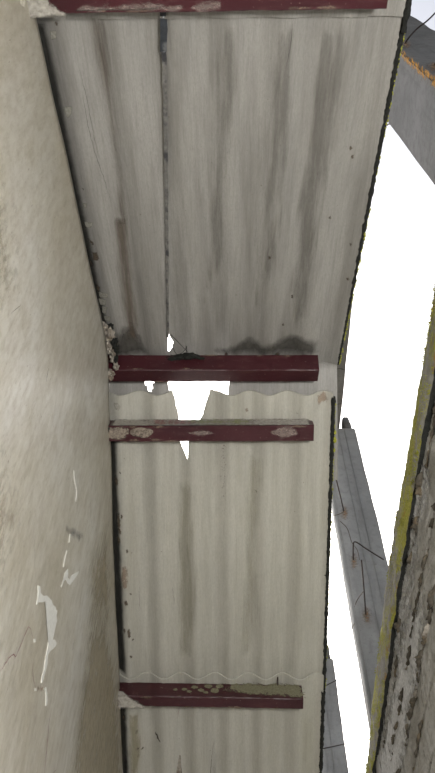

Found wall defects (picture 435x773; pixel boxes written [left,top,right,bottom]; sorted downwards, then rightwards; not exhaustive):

damp [222,337,314,353]
peeling [272,419,306,437]
damp [413,466,429,522]
peeling [34,586,57,706]
damp [376,531,424,773]